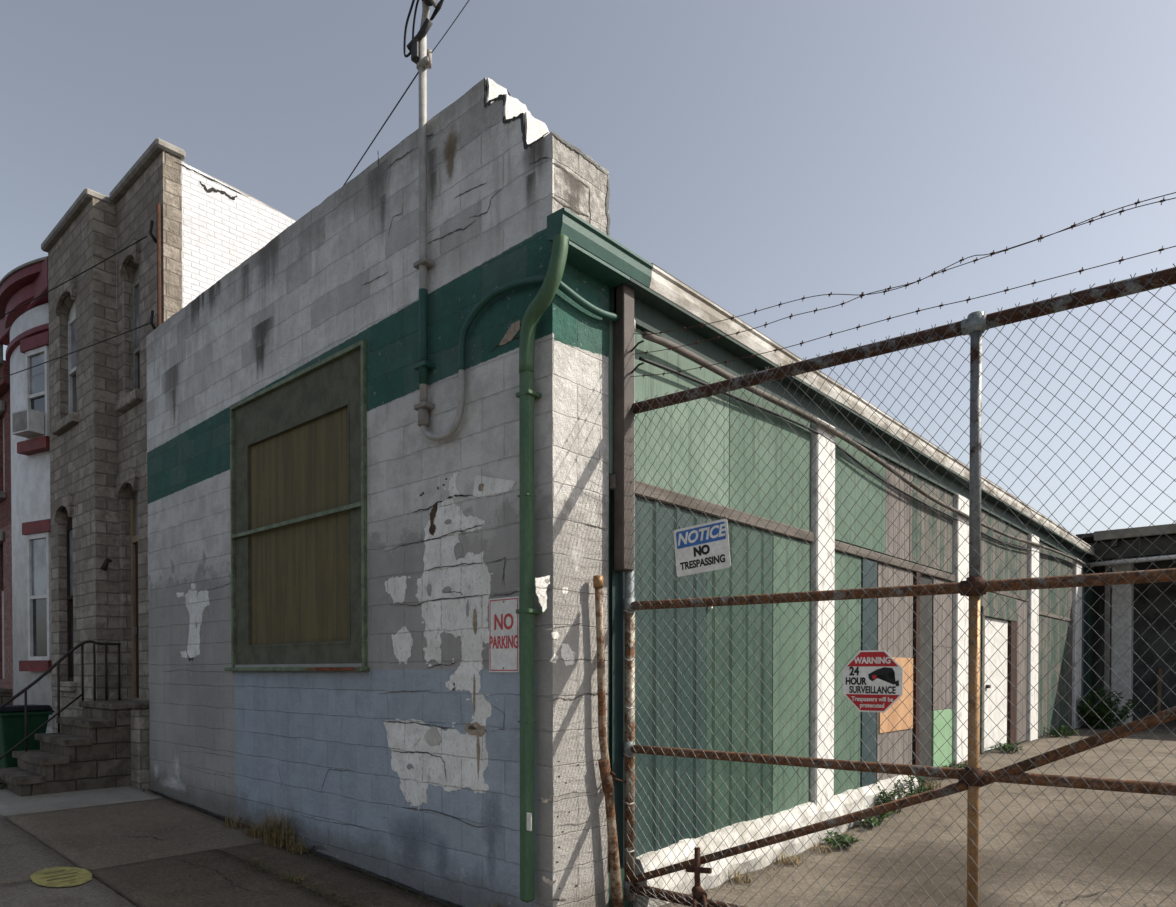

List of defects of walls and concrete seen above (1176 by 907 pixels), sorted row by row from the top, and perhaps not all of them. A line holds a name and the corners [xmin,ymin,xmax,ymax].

crack [174,161,249,200]
crack [428,182,502,244]
peeling [535,575,568,612]
peeling [176,583,210,661]
peeling [383,470,516,811]
peeling [550,631,575,666]
crack [1033,869,1171,907]